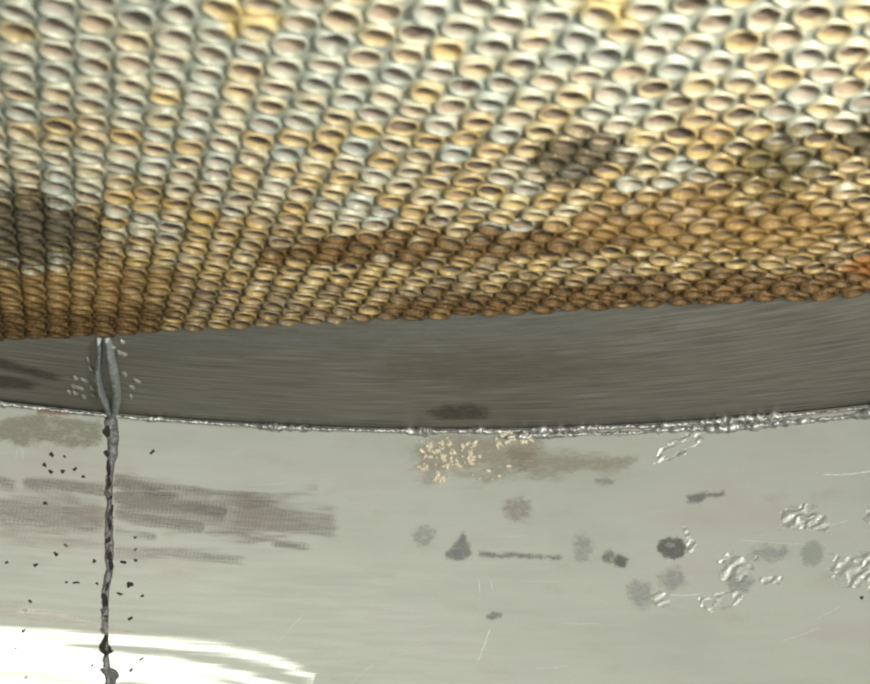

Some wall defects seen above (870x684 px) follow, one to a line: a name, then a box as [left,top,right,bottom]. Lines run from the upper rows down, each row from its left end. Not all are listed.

damp [527,129,637,188]
damp [0,189,105,272]
corrosion [358,255,870,323]